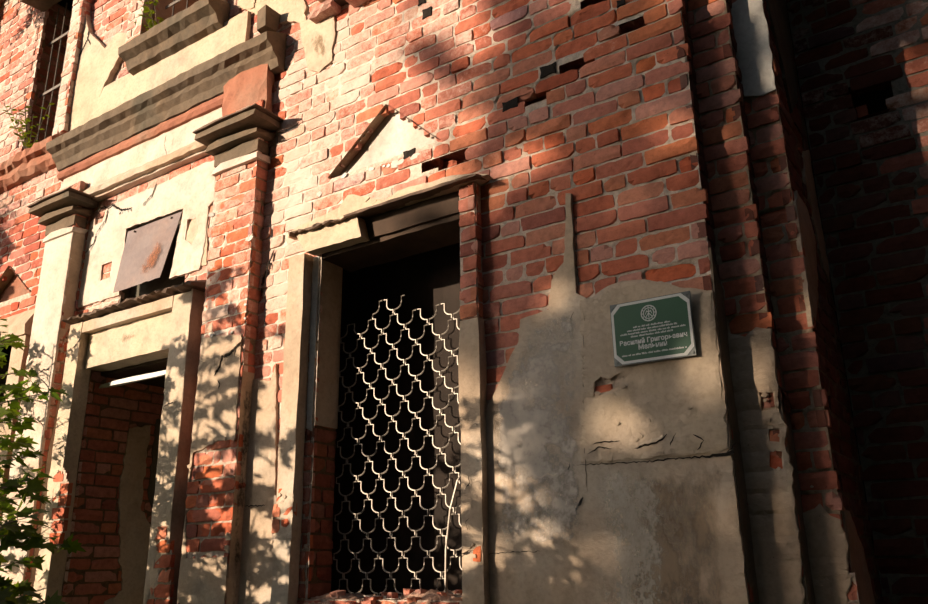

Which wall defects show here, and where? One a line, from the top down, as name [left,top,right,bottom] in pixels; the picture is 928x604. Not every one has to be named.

hole [577,0,606,14]
hole [619,17,646,36]
hole [540,57,595,79]
rust [143,245,160,270]
crack [215,338,242,389]
spalling [594,371,627,395]
spalling [146,434,244,604]
spalling [847,573,860,604]